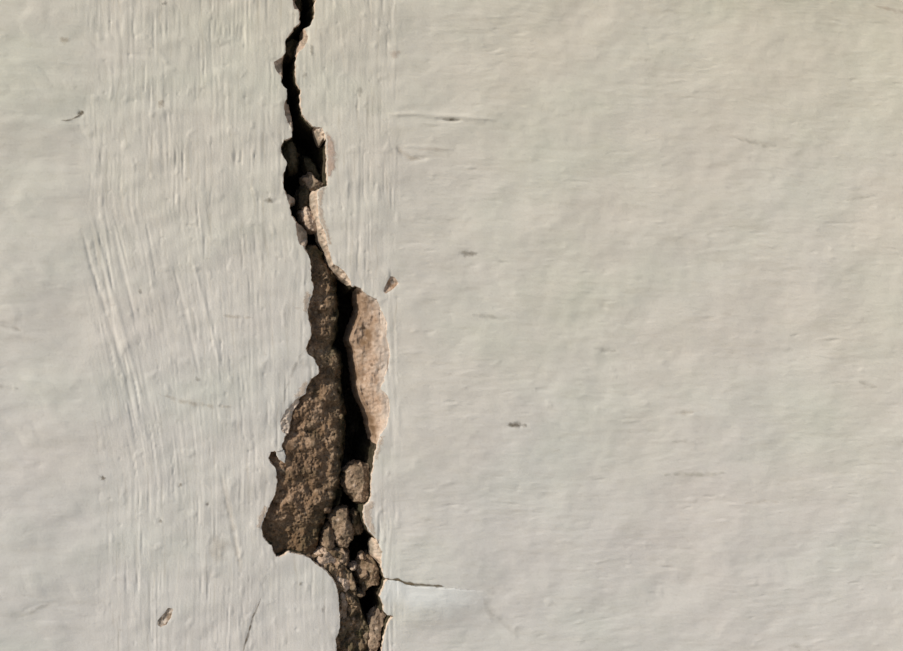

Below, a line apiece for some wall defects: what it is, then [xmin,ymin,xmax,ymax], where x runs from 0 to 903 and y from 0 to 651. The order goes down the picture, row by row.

crack [258,0,442,651]
peeling [384,276,398,293]